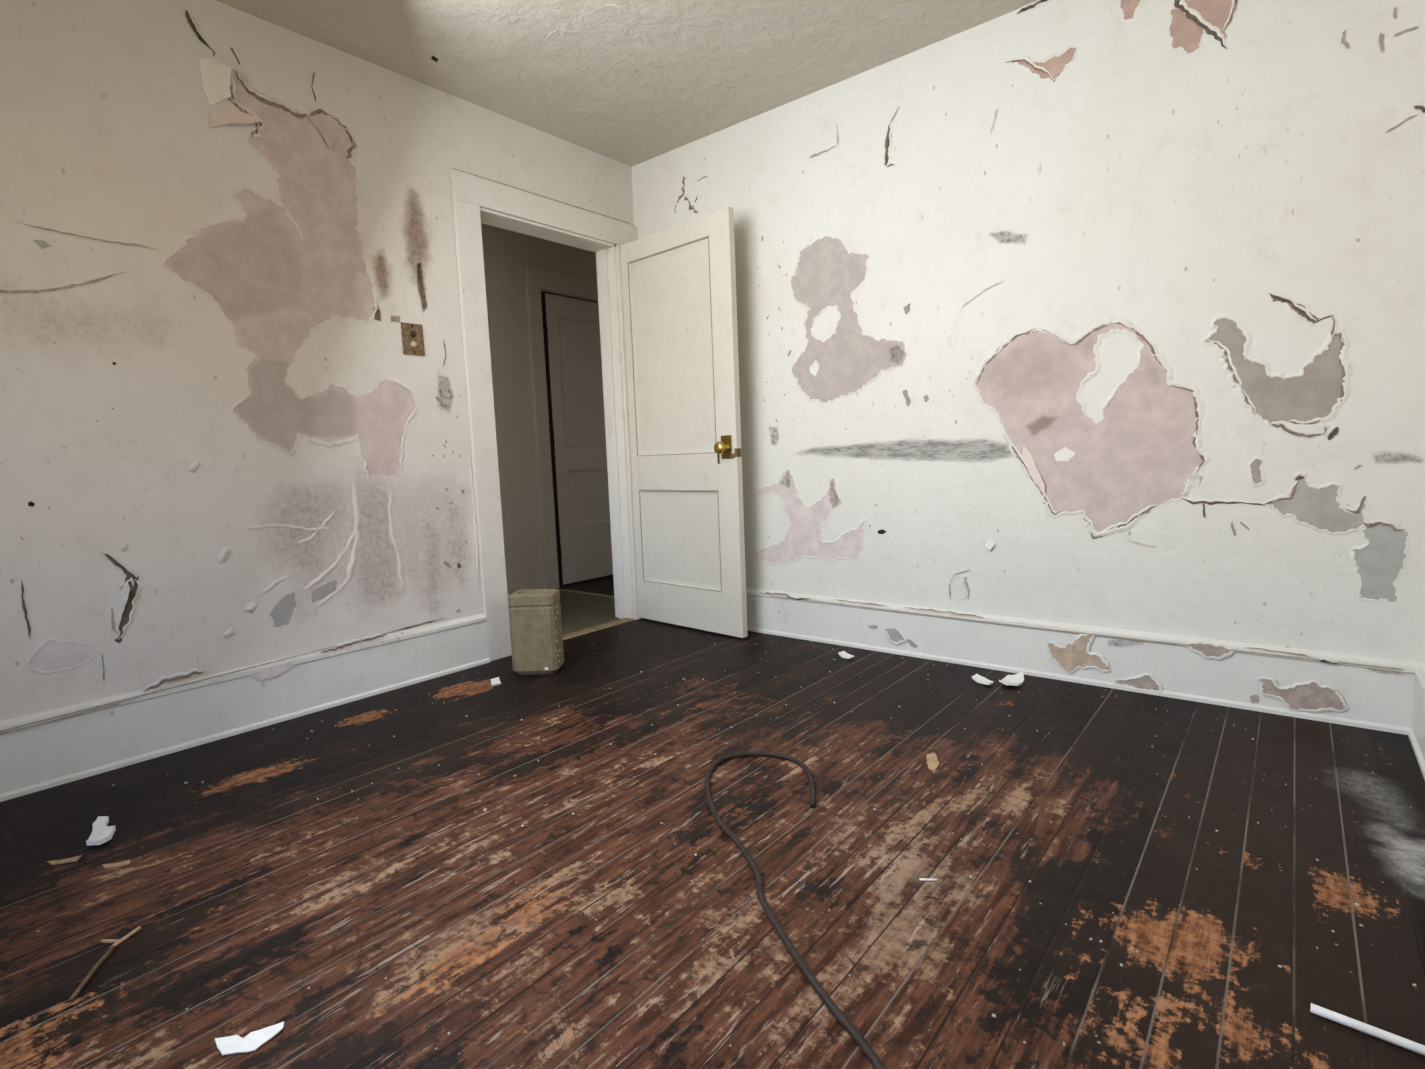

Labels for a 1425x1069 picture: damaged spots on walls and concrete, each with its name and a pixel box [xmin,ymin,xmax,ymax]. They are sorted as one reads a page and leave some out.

peeling [1004,45,1079,84]
peeling [1169,0,1237,53]
peeling [160,58,419,478]
peeling [767,234,909,404]
peeling [435,342,461,409]
peeling [902,389,933,406]
peeling [966,317,1210,539]
peeling [1200,312,1354,438]
peeling [751,468,877,566]
peeling [1247,456,1411,604]
peeling [1250,676,1349,713]